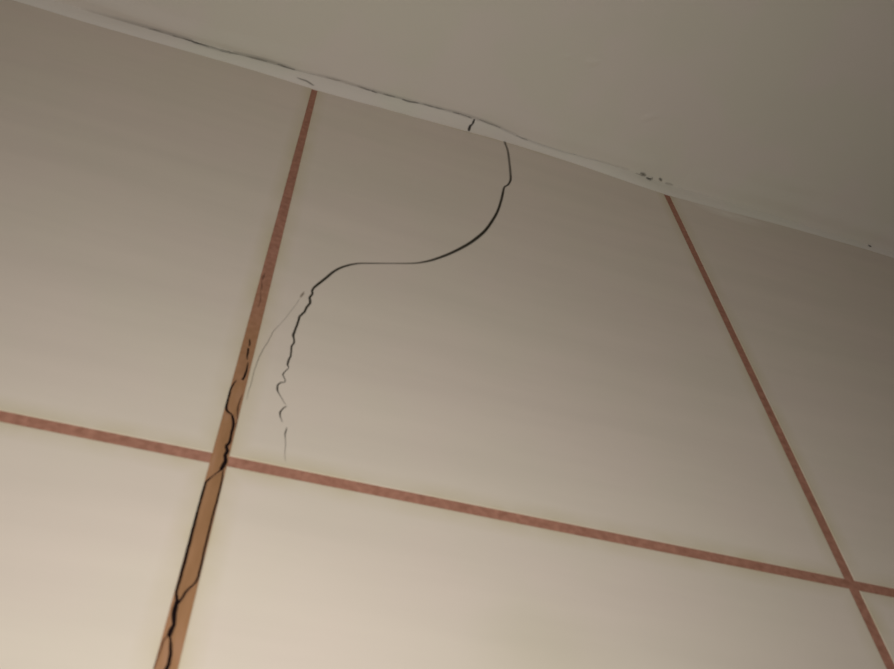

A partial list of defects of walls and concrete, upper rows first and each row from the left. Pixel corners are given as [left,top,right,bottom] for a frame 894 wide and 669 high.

crack [409,163,512,264]
crack [276,263,373,449]
crack [156,339,251,669]